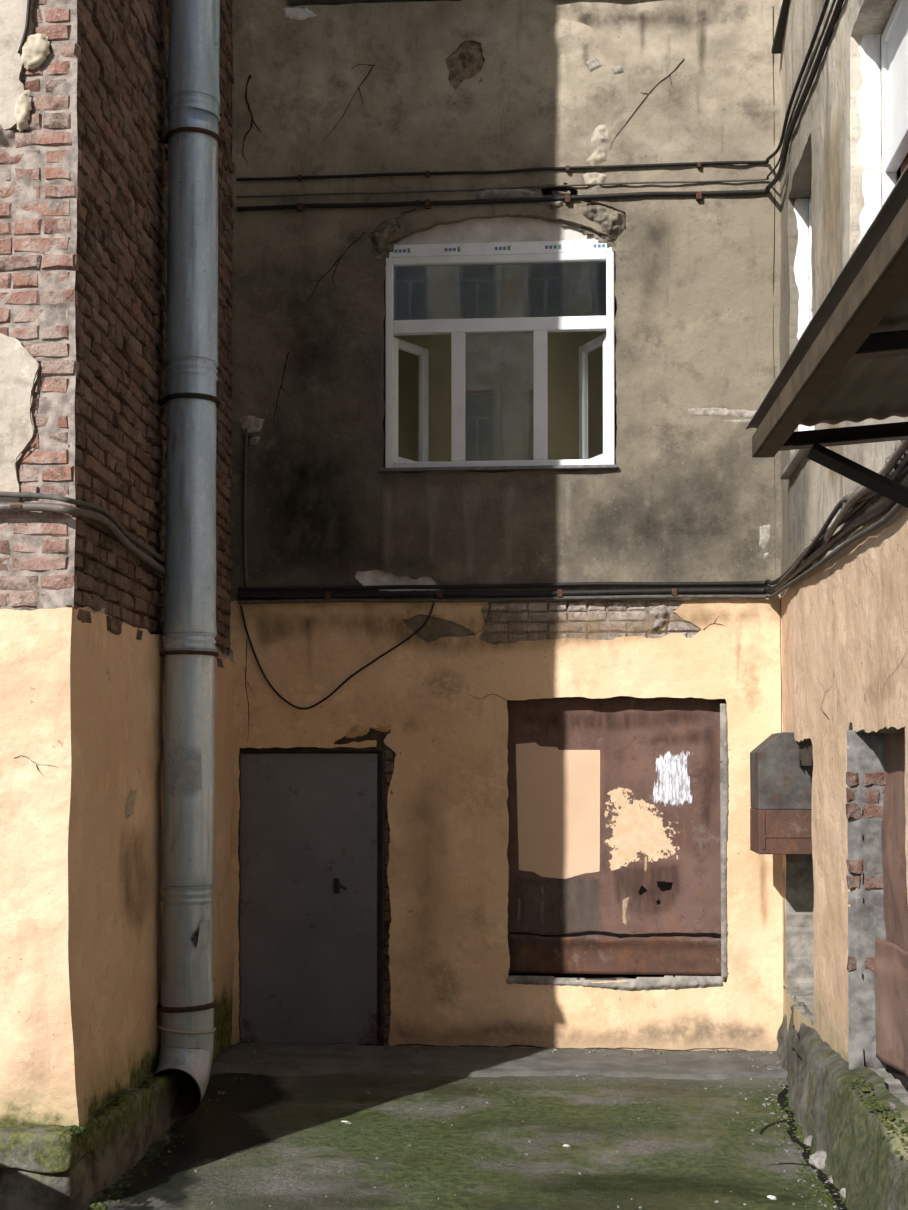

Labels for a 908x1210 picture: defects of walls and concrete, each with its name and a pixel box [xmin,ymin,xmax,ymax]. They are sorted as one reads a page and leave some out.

crack [242,75,262,166]
crack [324,63,375,140]
flaking render [445,33,485,90]
crack [609,59,684,149]
flaking render [0,0,82,611]
flaking render [403,597,701,645]
flaking render [320,727,401,1046]
flaking render [846,730,886,1070]